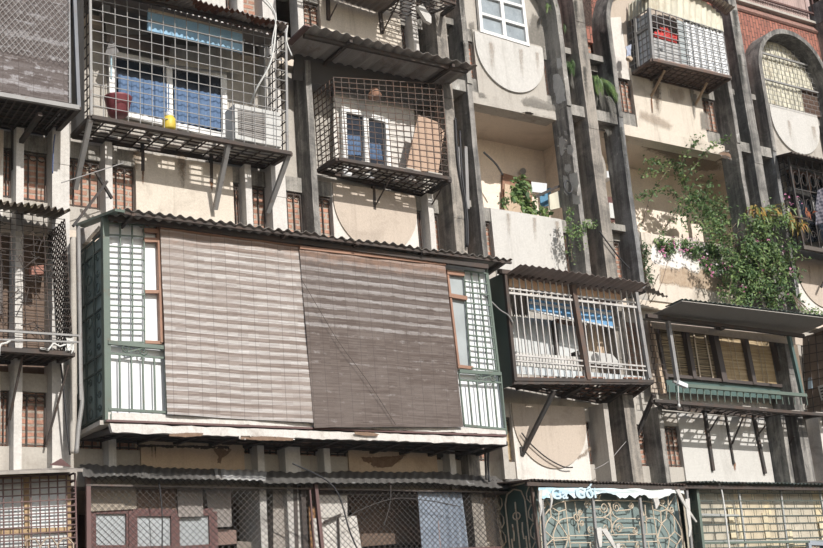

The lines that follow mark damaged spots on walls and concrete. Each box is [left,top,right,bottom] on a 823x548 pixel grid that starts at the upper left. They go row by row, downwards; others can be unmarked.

peeling [552,57,566,104]
flaking render [135,433,231,463]